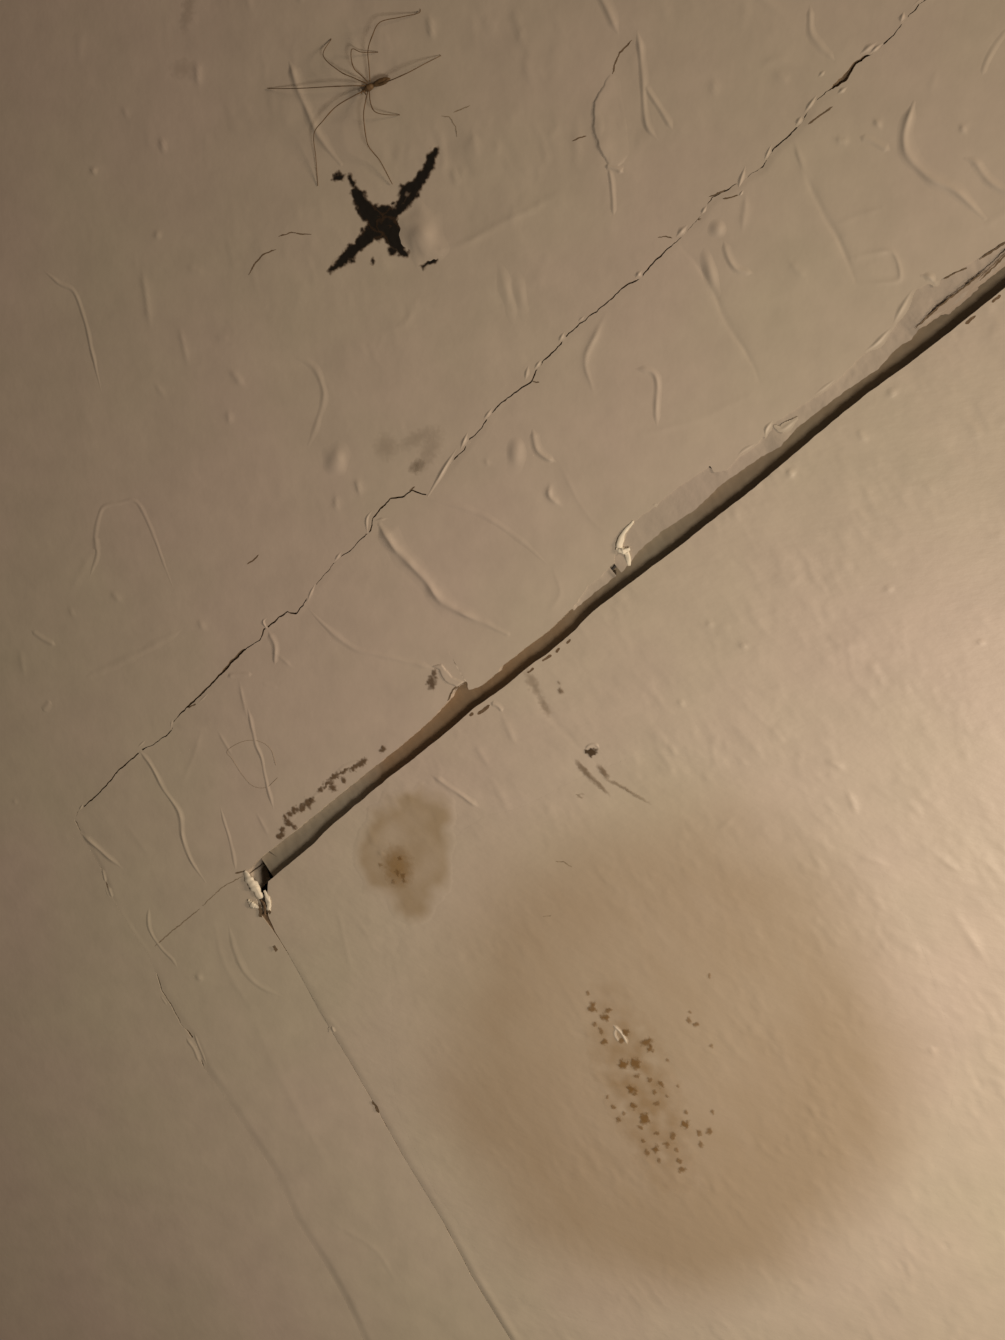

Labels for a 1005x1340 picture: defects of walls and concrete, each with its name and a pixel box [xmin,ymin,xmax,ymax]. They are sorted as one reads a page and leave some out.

crack [76,0,925,898]
spalling [572,242,1005,610]
crack [158,977,207,1065]
crack [262,914,287,951]
water stain [352,754,956,1332]